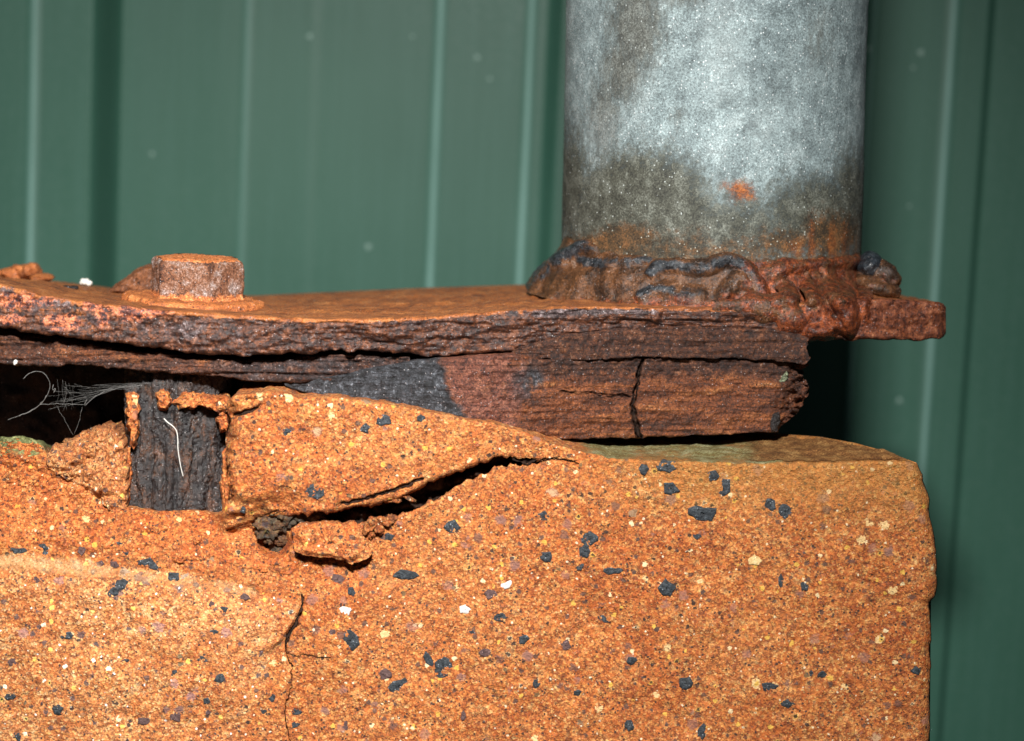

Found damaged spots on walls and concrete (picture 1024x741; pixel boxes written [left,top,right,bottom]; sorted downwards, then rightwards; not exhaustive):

rust [731,183,753,199]
crack [562,359,644,439]
spalling [0,420,300,575]
crack [261,456,578,526]
crack [284,594,321,741]